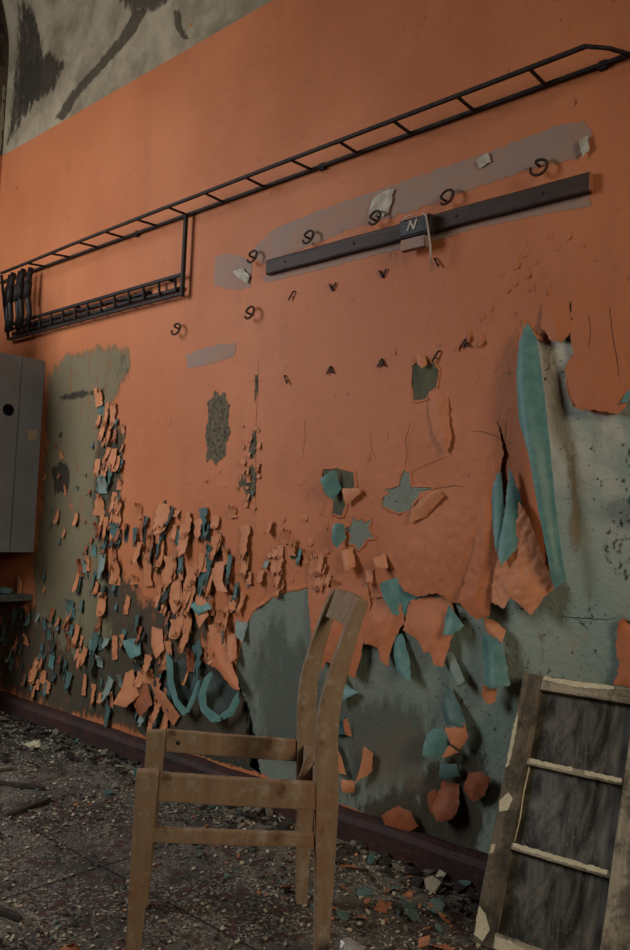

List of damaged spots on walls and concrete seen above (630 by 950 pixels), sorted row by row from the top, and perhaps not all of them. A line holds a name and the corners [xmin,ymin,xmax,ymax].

damp [0,0,64,145]
damp [56,0,167,120]
damp [174,10,188,39]
peeling [0,286,630,854]